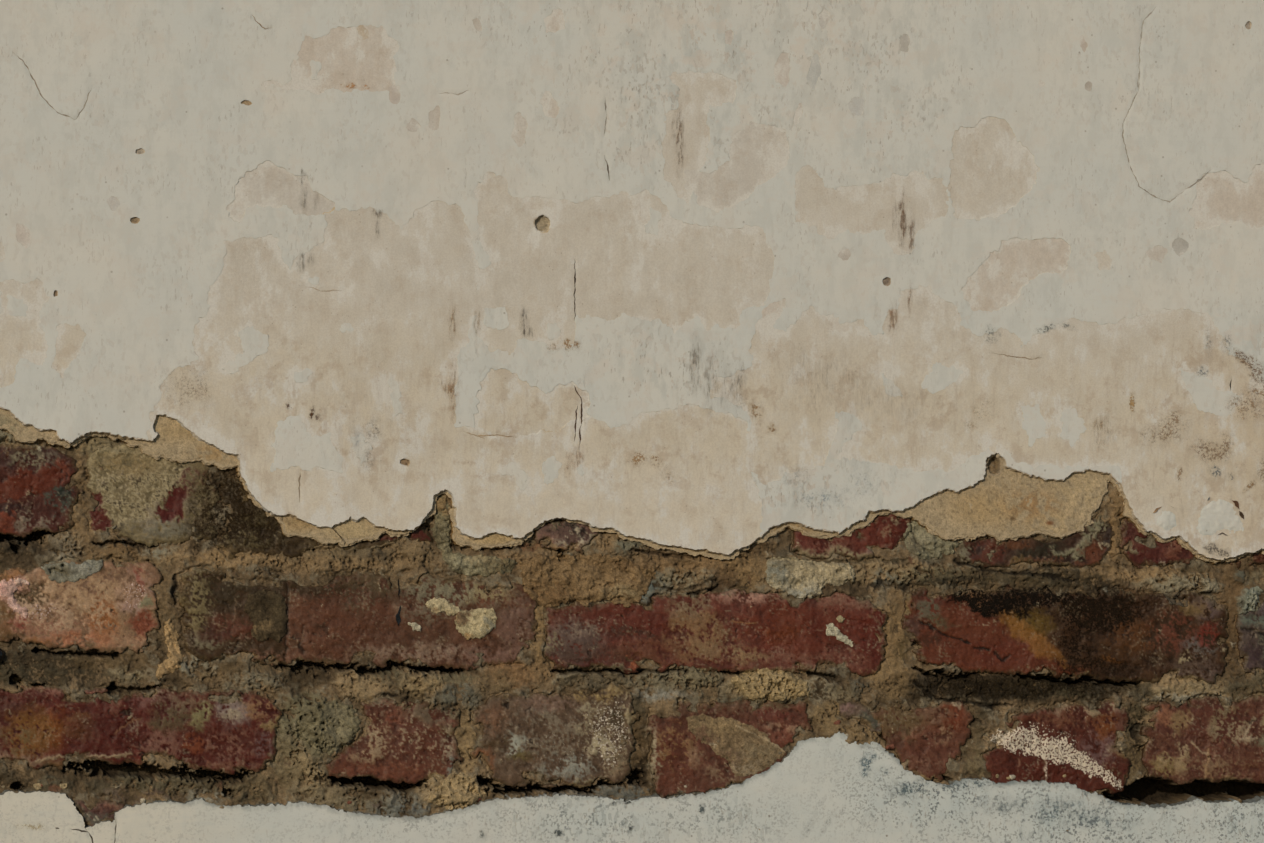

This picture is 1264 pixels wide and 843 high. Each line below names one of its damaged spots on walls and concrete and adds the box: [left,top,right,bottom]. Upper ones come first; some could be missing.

peeling [263,25,400,104]
crack [1122,9,1208,202]
peeling [0,71,1264,611]
flaking render [0,577,30,618]
flaking render [156,618,184,681]
flaking render [426,597,497,640]
flaking render [826,615,853,647]
flaking render [731,668,810,702]
flaking render [294,700,361,756]
flaking render [686,713,786,777]
flaking render [429,772,486,811]